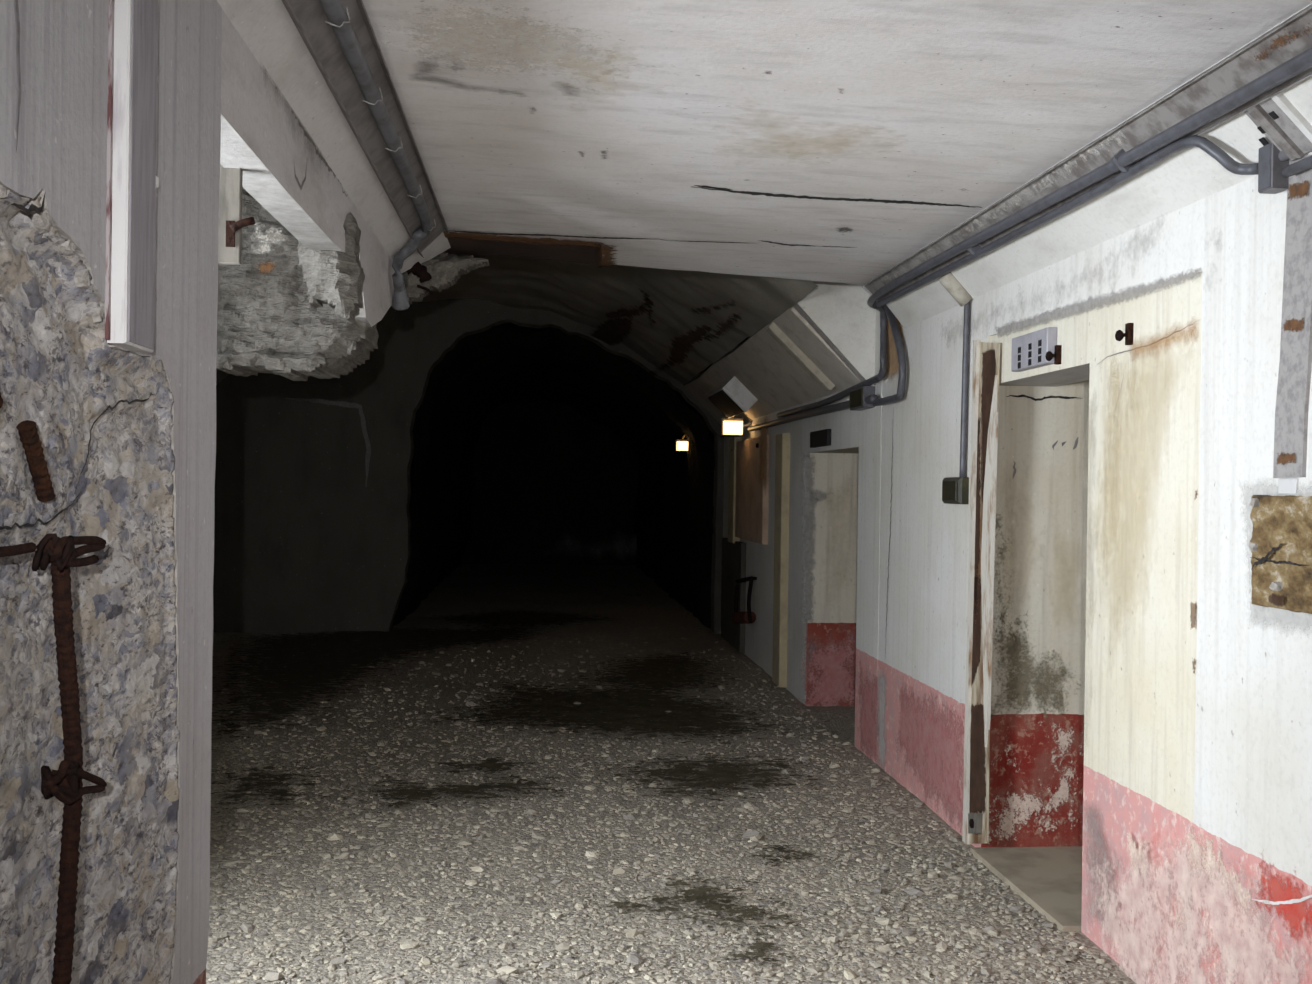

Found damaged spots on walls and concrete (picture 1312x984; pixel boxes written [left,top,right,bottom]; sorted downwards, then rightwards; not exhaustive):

crack [694,185,982,208]
spalling [216,187,379,381]
spalling [402,252,489,304]
corrosion [649,300,741,377]
spalling [0,185,180,984]
mould [991,594,1067,716]
peeling [989,722,1083,844]